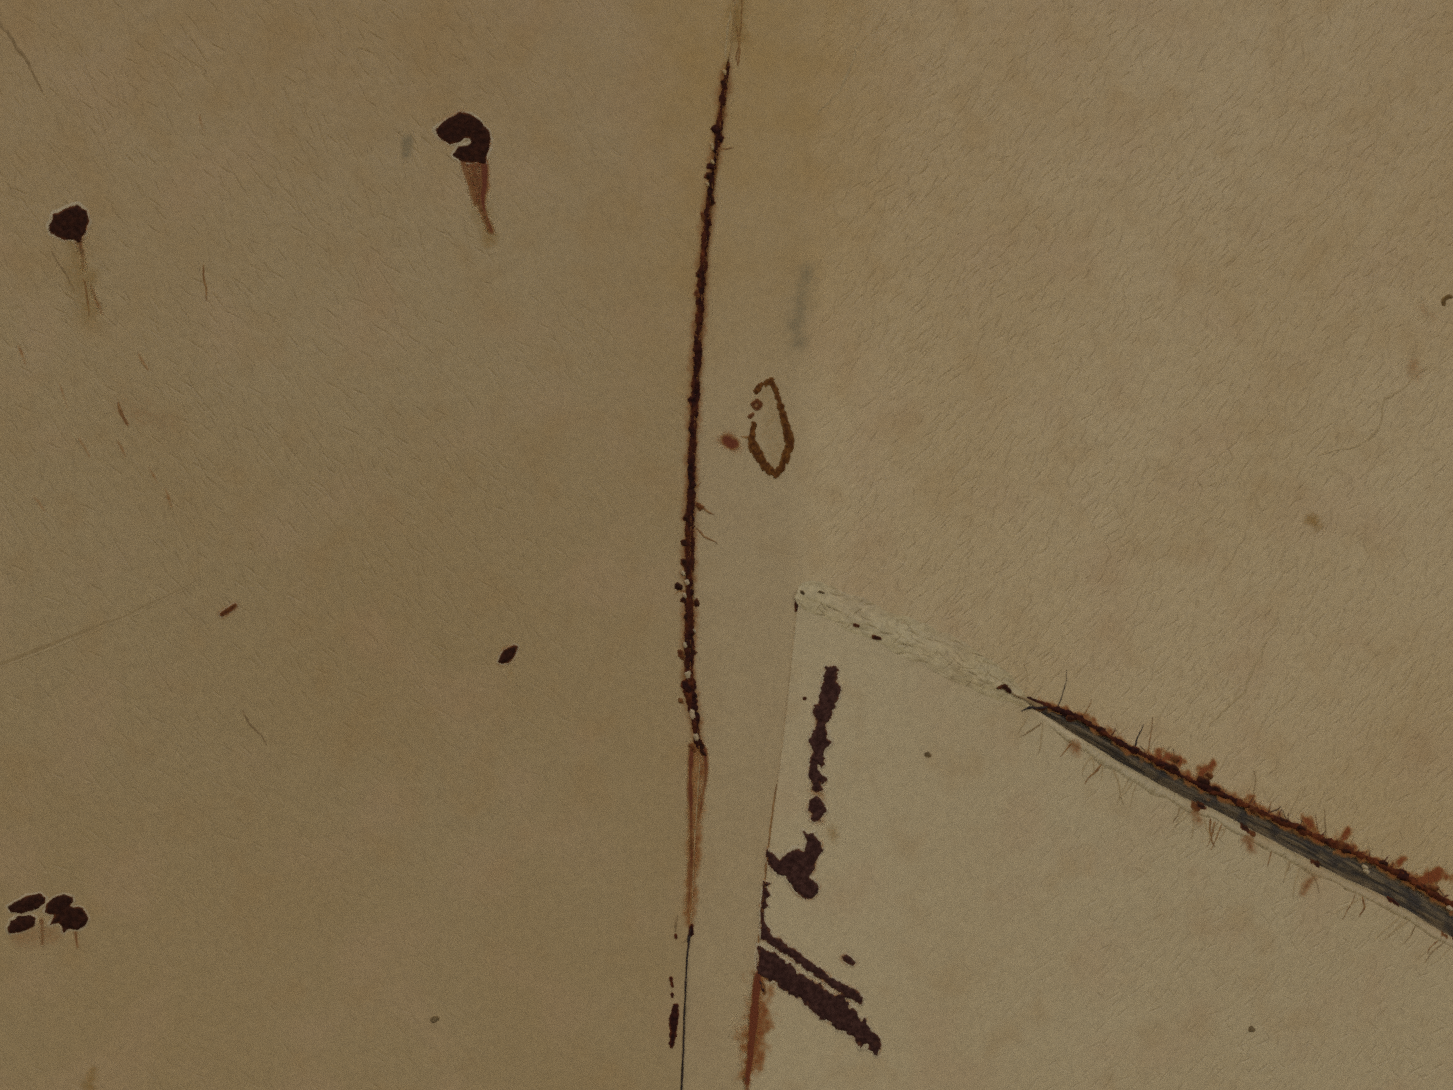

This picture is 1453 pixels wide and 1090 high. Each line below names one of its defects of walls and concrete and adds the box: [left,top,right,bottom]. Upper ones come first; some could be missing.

corrosion [721,377,795,479]
corrosion [682,59,730,924]
corrosion [764,784,777,880]
corrosion [997,664,1453,962]
corrosion [740,964,773,1090]